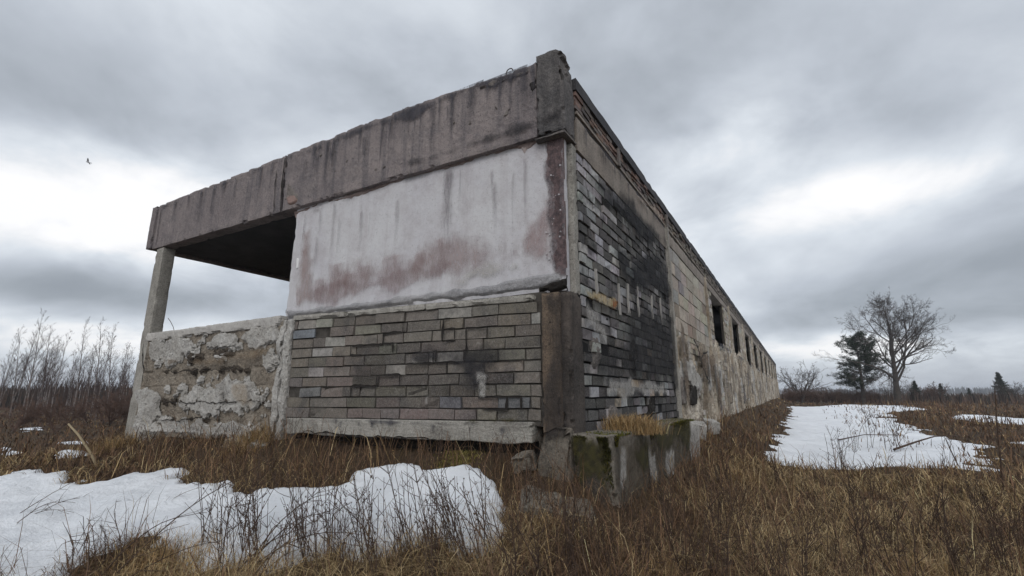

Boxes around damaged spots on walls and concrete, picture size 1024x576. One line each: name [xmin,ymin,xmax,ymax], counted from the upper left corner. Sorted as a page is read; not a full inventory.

damp [313,64,534,159]
peeling [129,325,280,443]
damp [620,423,700,509]